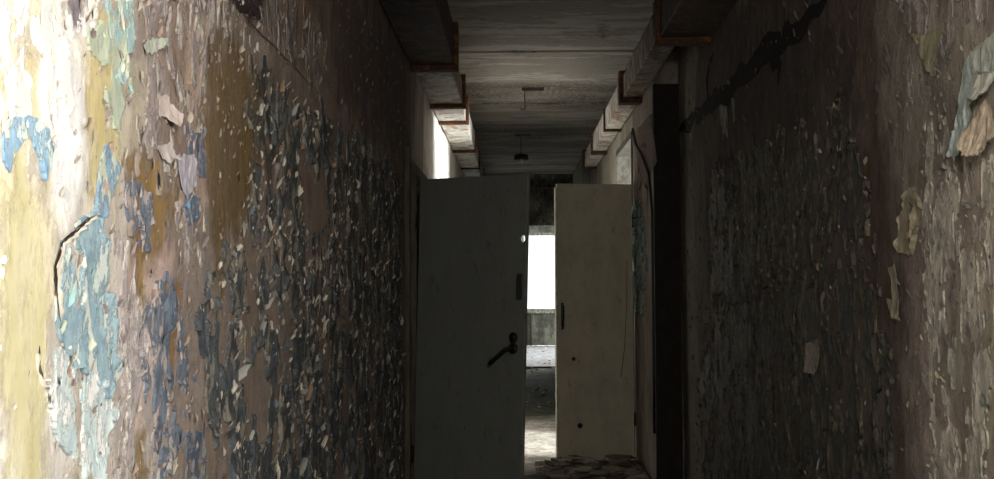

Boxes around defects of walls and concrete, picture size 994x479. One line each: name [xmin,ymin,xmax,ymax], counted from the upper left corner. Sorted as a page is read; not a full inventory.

crack [55,215,98,321]
crack [127,153,186,237]
peeling [886,0,994,479]
flaking render [804,339,820,375]